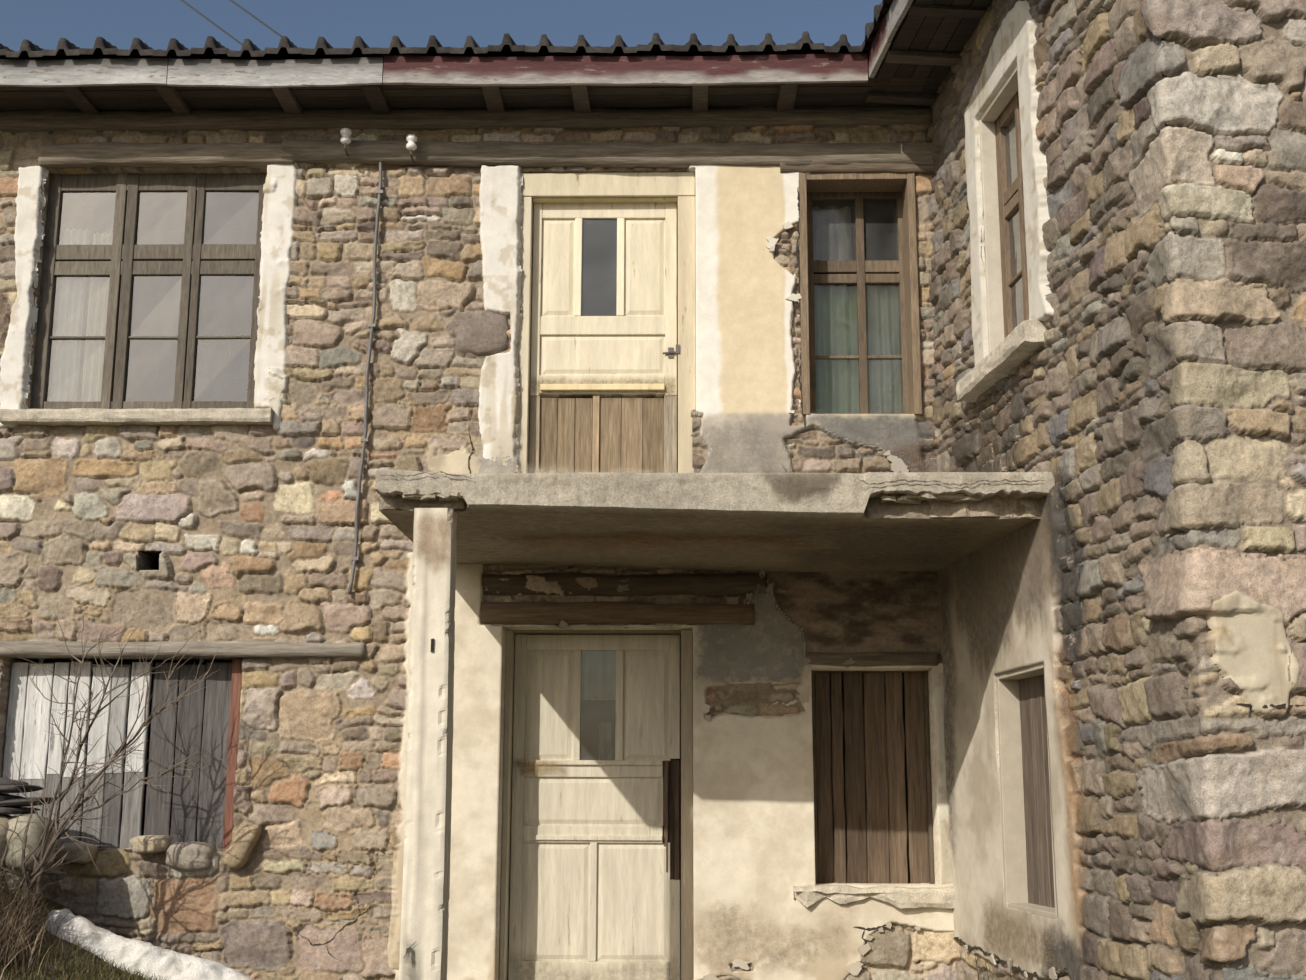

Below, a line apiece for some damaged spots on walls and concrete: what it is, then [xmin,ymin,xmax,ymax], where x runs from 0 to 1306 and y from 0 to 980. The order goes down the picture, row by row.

spalling [766,221,909,474]
leakage [699,426,837,498]
leakage [821,416,937,472]
spalling [483,565,760,605]
leakage [941,476,1085,829]
spalling [698,683,809,722]
spalling [693,959,754,980]
spalling [844,922,1070,980]